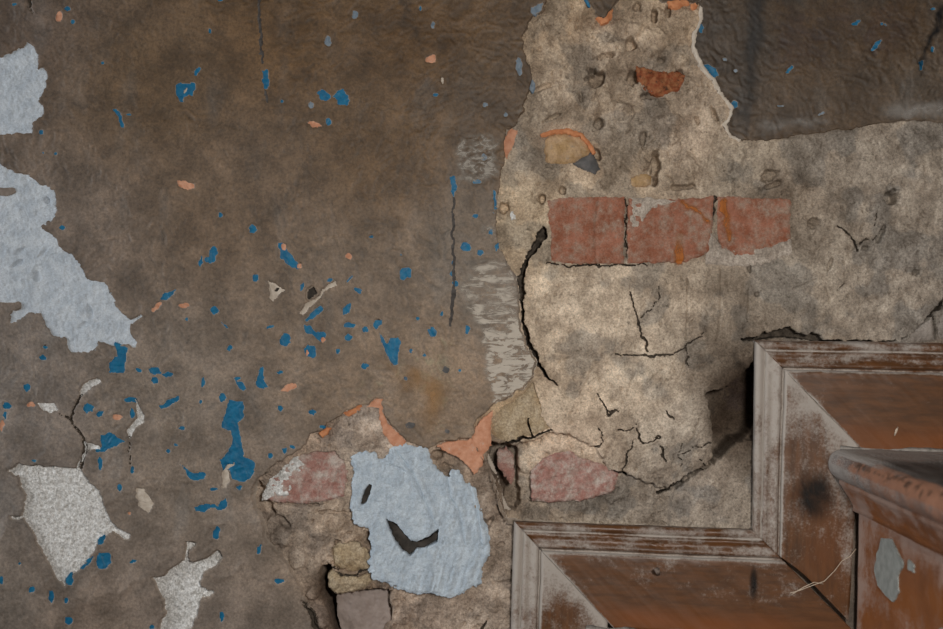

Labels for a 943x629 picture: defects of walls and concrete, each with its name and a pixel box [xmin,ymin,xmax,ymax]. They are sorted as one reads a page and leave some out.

peeling [0,42,48,135]
peeling [176,67,201,102]
peeling [177,180,194,190]
crack [837,213,877,252]
spalling [194,0,943,629]
crack [517,199,648,386]
crack [615,286,704,366]
crack [741,326,905,342]
crack [924,299,943,331]
peeling [0,164,189,586]
peeling [180,464,206,481]
spalling [149,526,222,629]